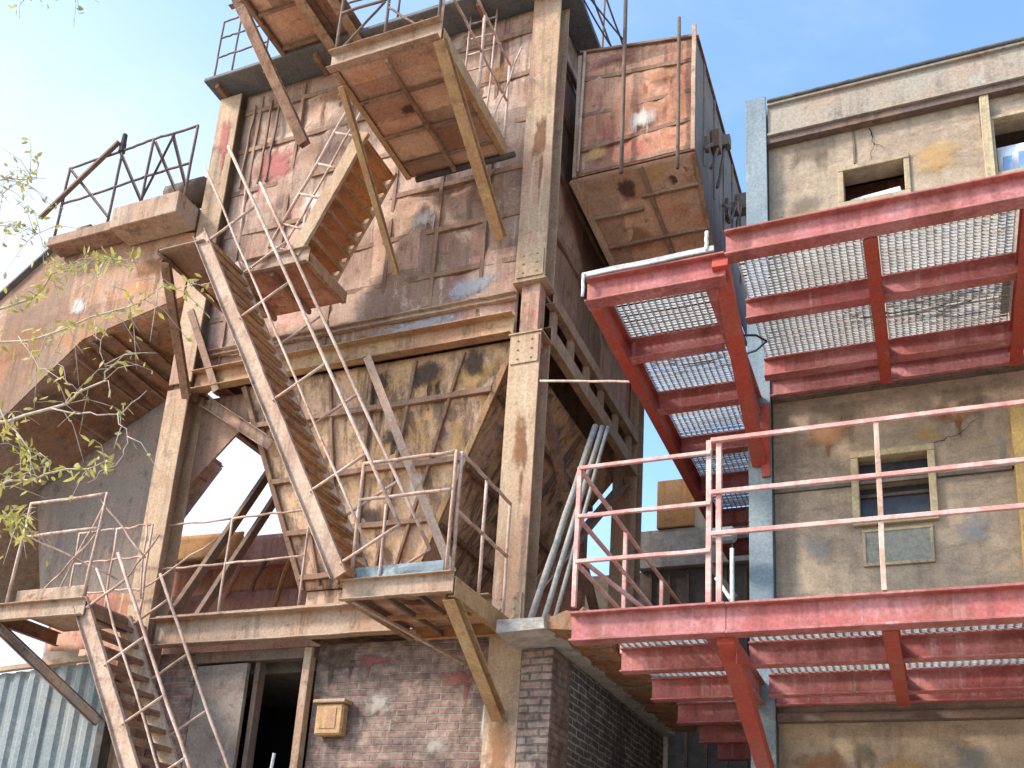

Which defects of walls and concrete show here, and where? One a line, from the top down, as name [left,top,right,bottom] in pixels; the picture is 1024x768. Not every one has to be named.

peeling [448,273,495,300]
damp [464,349,482,375]
damp [413,361,445,396]